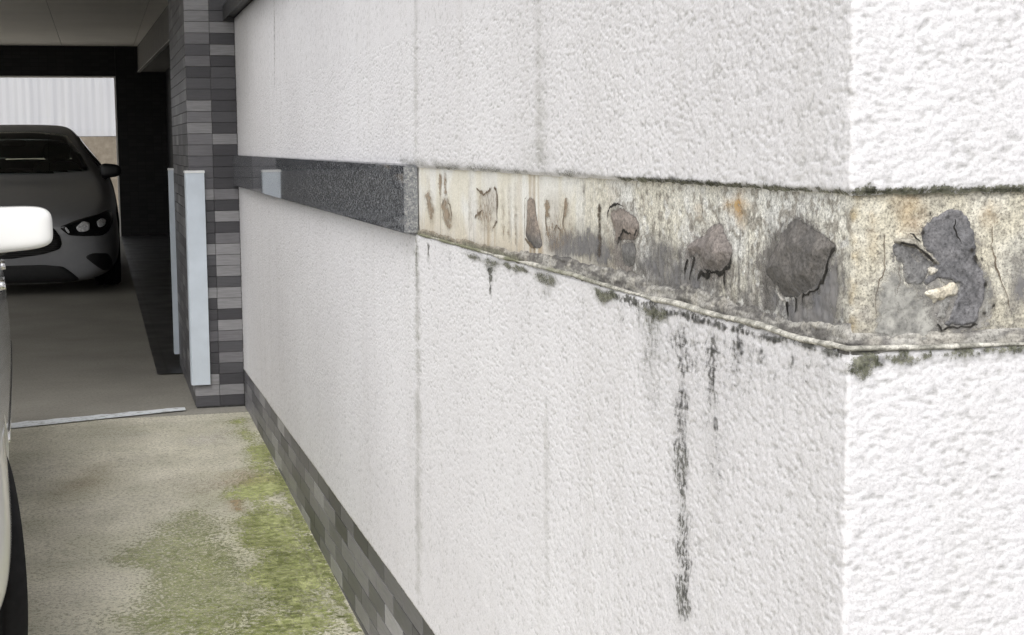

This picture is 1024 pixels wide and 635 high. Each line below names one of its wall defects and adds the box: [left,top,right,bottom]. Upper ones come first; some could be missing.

water stain [425,173,451,229]
water stain [549,204,612,265]
water stain [760,255,844,331]
water stain [874,271,935,340]
peeling [893,209,995,326]
water stain [610,294,841,405]
water stain [673,389,692,620]